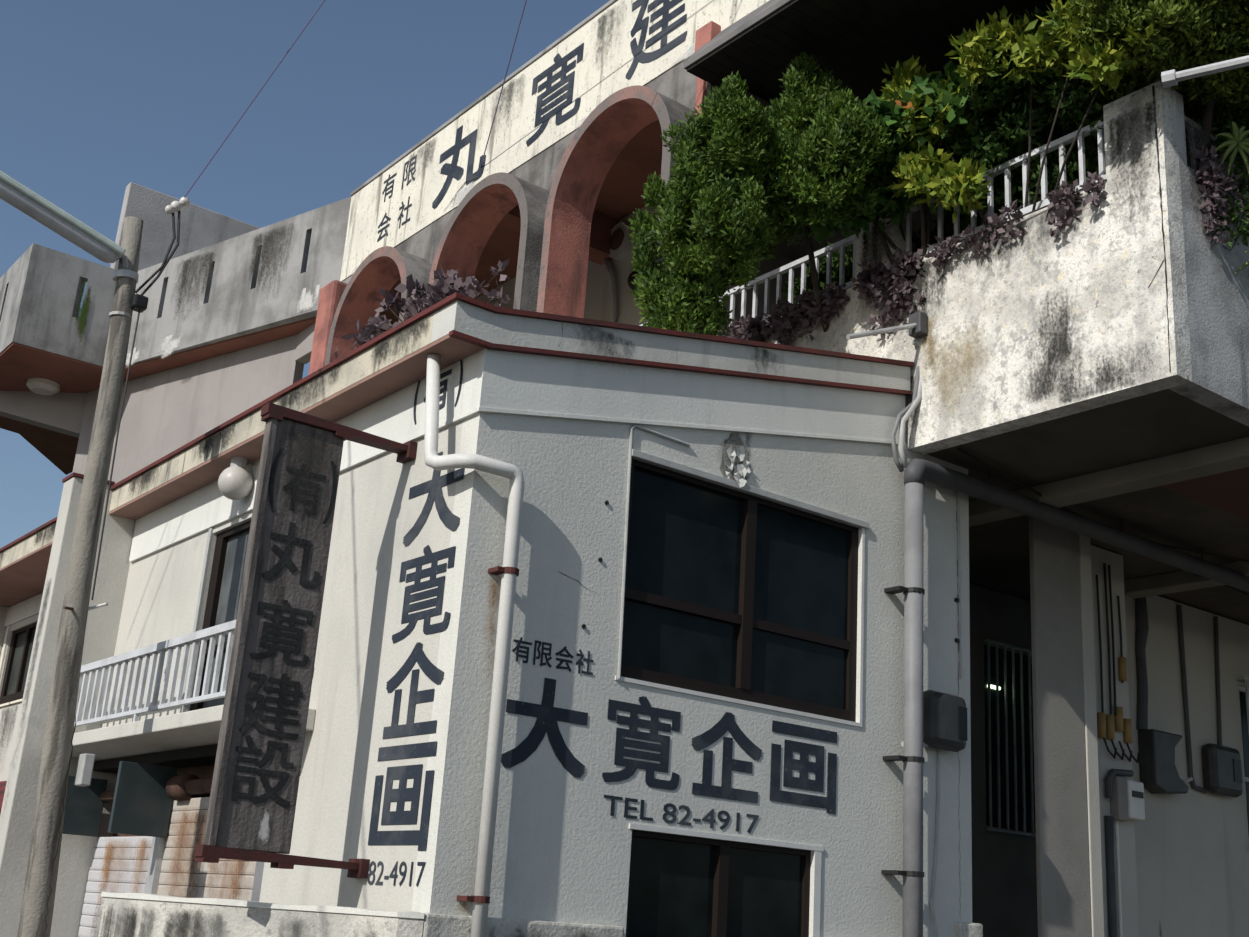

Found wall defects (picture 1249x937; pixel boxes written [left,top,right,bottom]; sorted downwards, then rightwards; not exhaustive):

water stain [178,254,212,301]
water stain [251,229,288,284]
water stain [1027,309,1148,402]
water stain [93,907,152,937]
water stain [164,911,221,937]